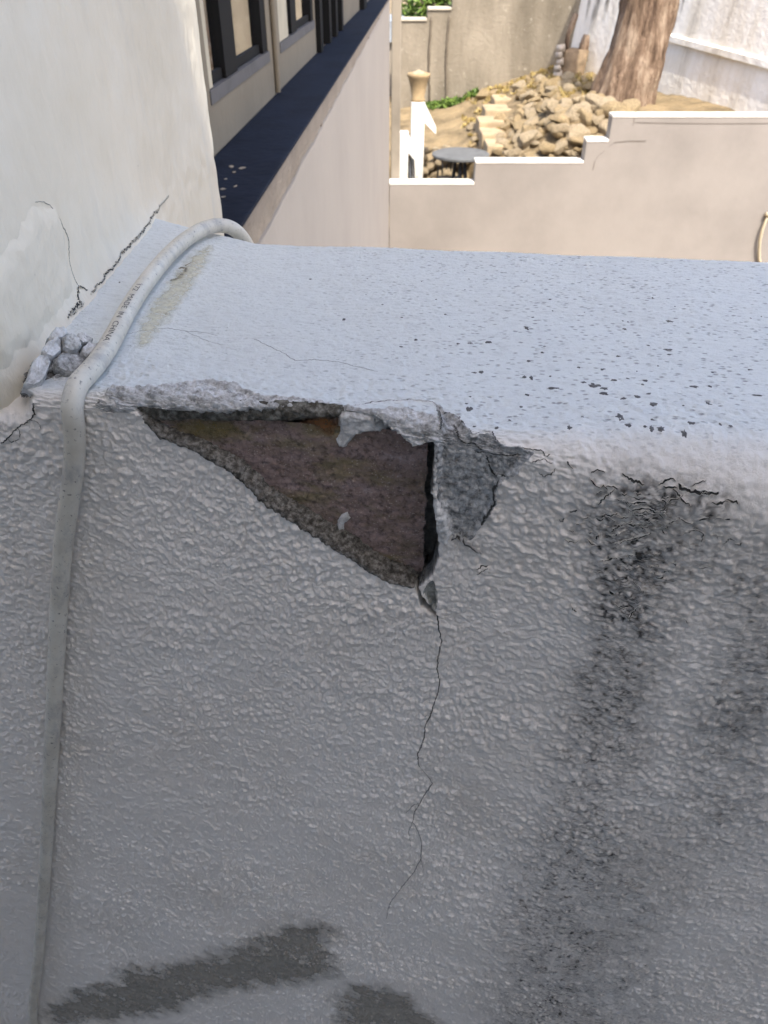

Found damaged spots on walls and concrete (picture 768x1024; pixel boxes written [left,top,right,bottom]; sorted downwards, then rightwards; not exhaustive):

crack [35,195,169,319]
spalling [20,326,97,398]
peeling [581,368,665,432]
spalling [95,378,534,610]
damp [576,480,677,725]
crack [386,614,443,918]
damp [49,925,335,1024]
damp [338,985,435,1024]
damp [510,851,598,1024]